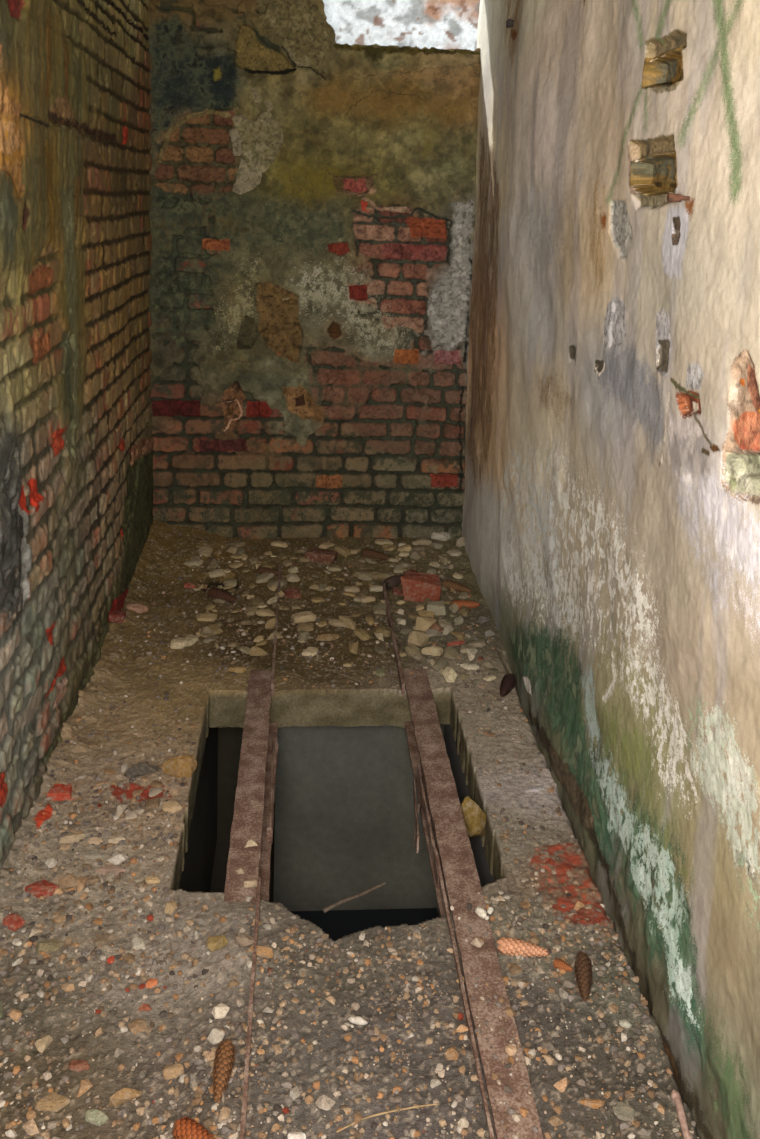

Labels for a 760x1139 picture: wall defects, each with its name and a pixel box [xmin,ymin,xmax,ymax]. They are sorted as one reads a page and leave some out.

flaking render [0,43,26,205]
leakage [149,13,241,163]
flaking render [153,21,296,195]
spalling [641,29,687,94]
flaking render [199,381,325,453]
flaking render [316,474,343,489]
flaking render [328,173,454,364]
leakage [149,58,760,929]
spalling [609,133,689,283]
flaking render [655,309,672,378]
flaking render [667,348,760,506]
corrosion [266,736,278,845]